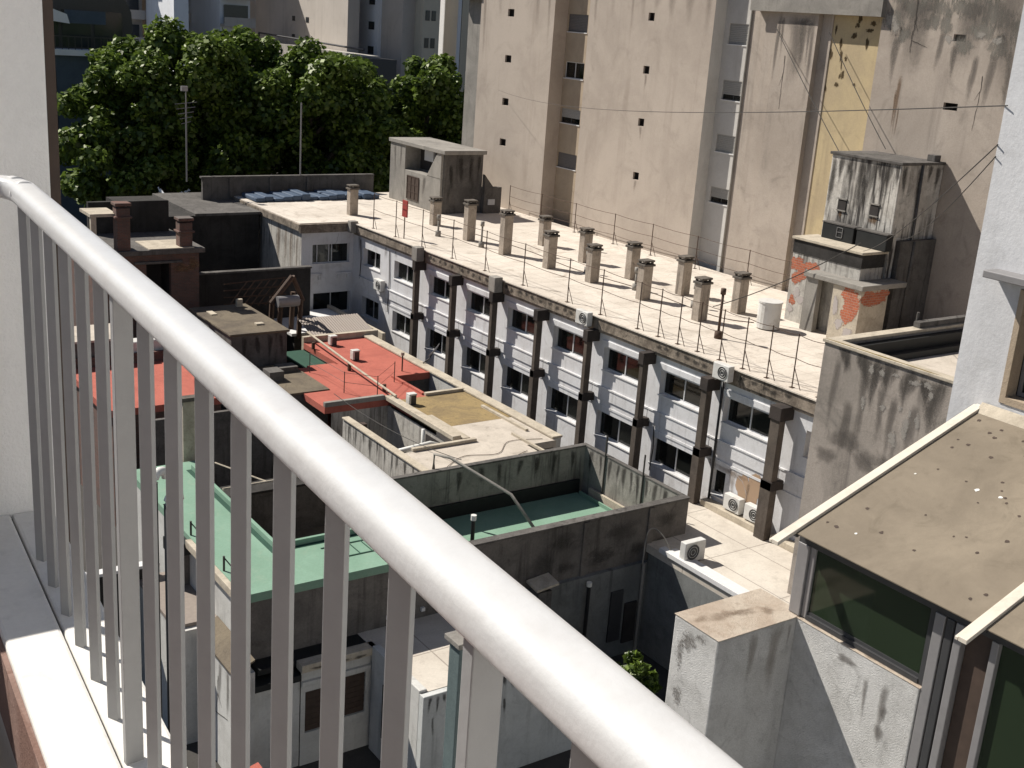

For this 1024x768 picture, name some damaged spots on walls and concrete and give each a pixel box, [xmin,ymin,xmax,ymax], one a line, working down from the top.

water stain [828,159,940,204]
flaking render [787,256,820,312]
flaking render [832,287,890,336]
water stain [841,350,945,429]
water stain [589,453,667,500]
water stain [676,631,706,669]